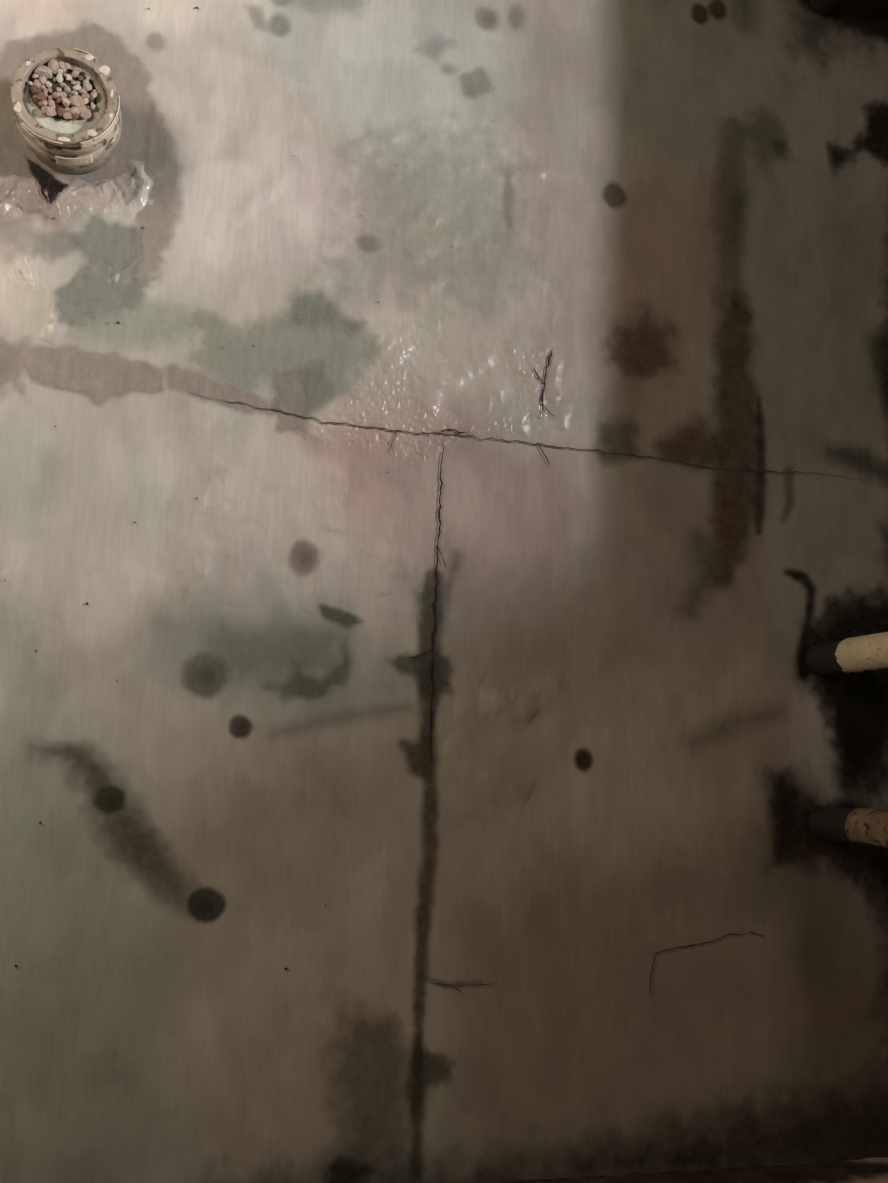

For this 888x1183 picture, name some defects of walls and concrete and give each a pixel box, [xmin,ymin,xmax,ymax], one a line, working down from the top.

leakage [692,0,725,23]
leakage [829,103,888,167]
leakage [604,184,624,206]
leakage [0,25,374,430]
leakage [292,543,317,572]
crack [166,347,887,789]
leakage [321,606,360,626]
leakage [283,655,348,697]
leakage [785,570,888,799]
leakage [575,749,591,769]
leakage [53,749,224,921]
crack [650,932,765,992]